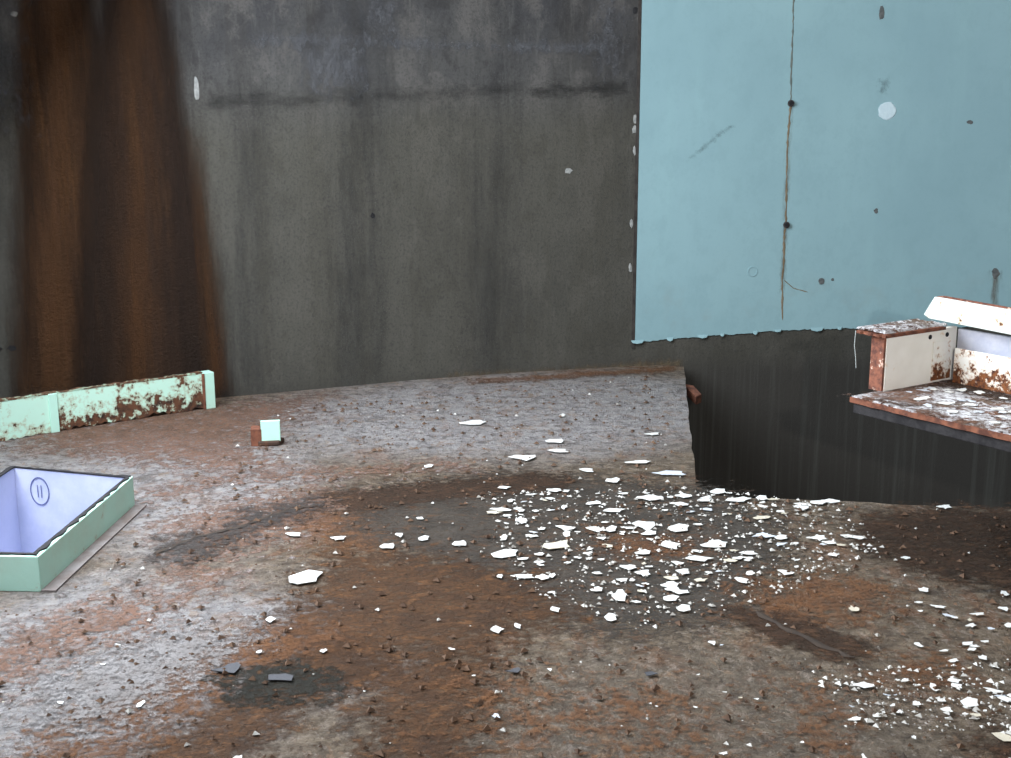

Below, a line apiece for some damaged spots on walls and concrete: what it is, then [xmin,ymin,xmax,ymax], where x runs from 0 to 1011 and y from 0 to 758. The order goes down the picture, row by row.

crack [781,0,807,320]
rust [0,0,774,758]
rust [710,501,1011,758]